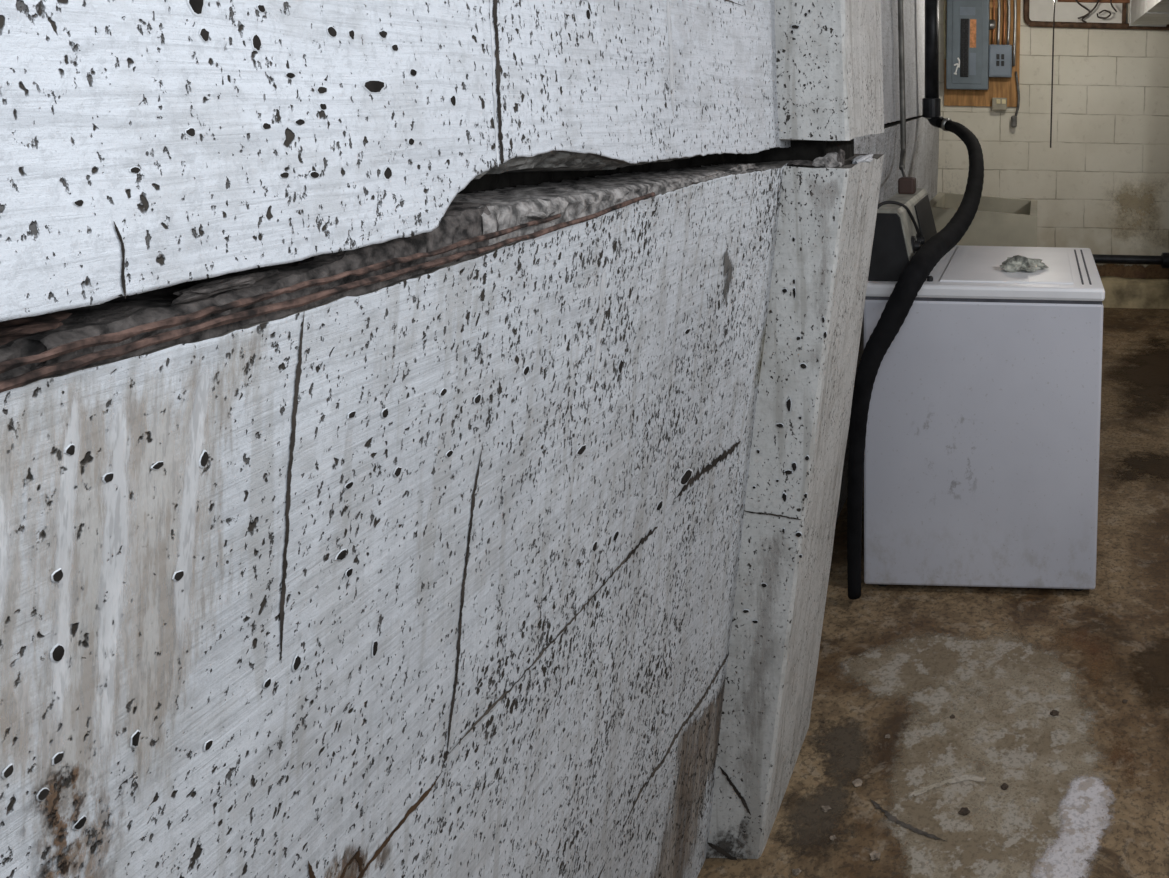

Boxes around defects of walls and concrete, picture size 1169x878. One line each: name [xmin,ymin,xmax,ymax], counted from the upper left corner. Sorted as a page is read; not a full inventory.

crack [0,0,873,659]
crack [308,450,657,878]
crack [621,653,729,832]
crack [708,842,737,860]
crack [719,766,751,815]
damp [843,630,1116,878]
damp [1131,638,1169,708]